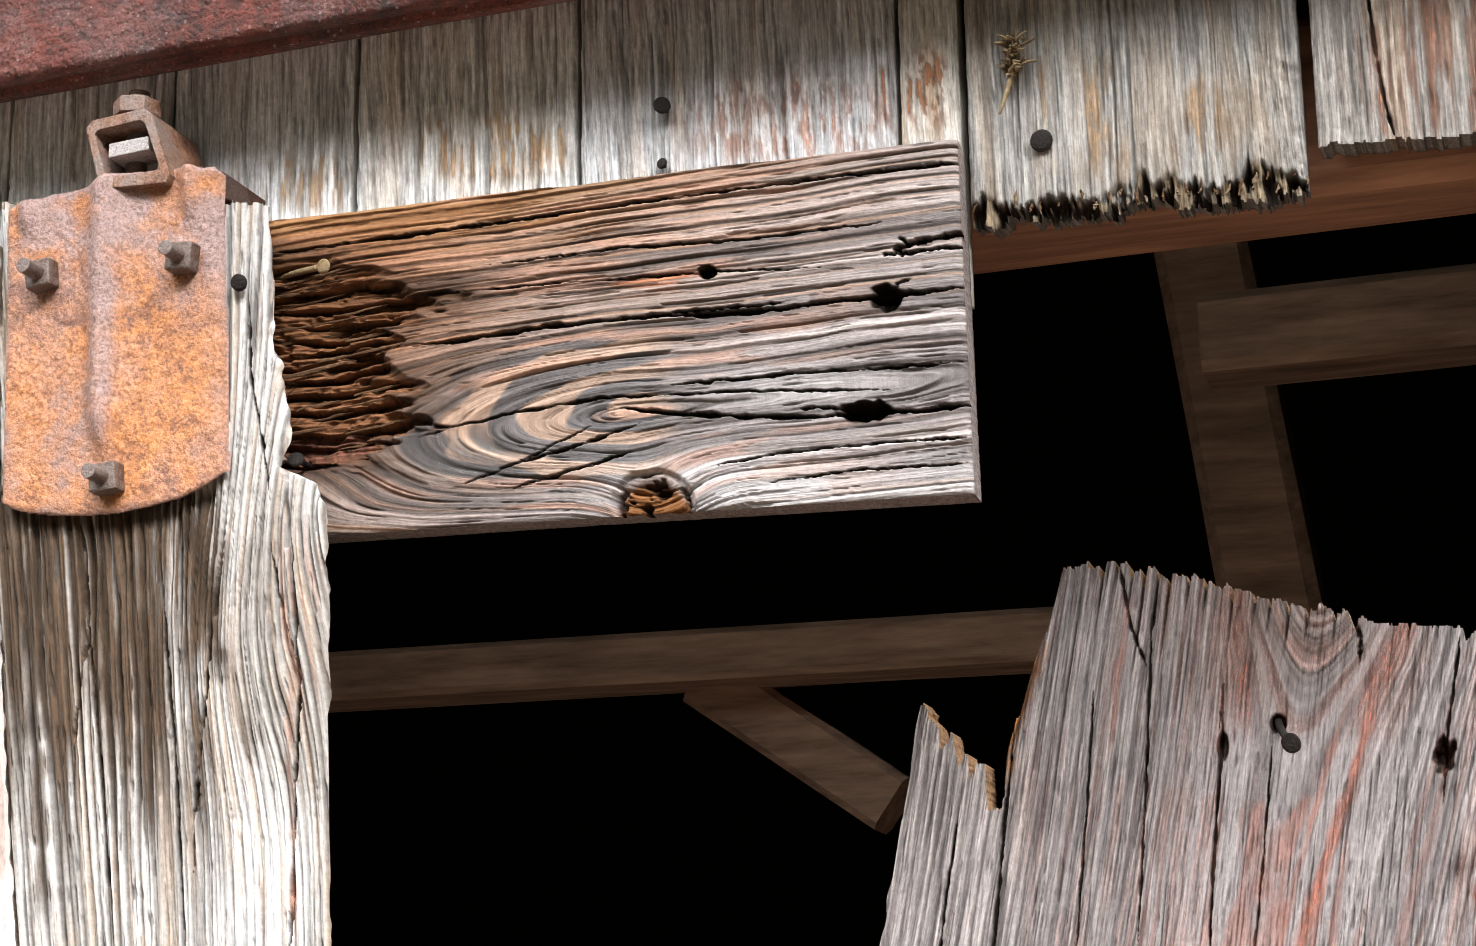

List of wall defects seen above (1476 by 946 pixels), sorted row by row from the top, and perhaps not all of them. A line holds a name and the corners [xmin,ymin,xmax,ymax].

corrosion [718,80,850,152]
corrosion [880,67,888,122]
corrosion [907,54,944,122]
corrosion [1084,72,1107,165]
corrosion [1187,78,1224,143]
corrosion [1375,0,1476,134]
crack [272,162,953,254]
crack [413,221,963,347]
crack [424,362,971,489]
crack [1120,571,1157,942]